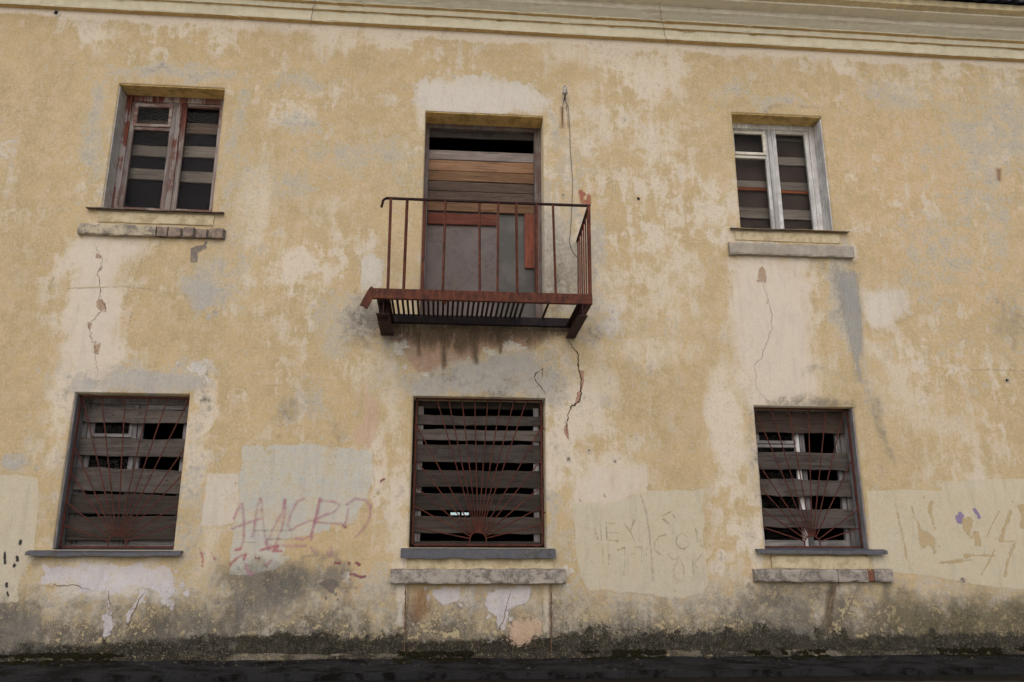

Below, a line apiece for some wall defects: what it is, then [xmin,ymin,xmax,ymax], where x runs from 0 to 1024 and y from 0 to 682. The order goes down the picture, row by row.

peeling [407,73,552,116]
crack [87,251,106,388]
peeling [55,234,212,397]
leakage [392,324,569,366]
leakage [840,273,862,379]
crack [556,334,584,444]
leakage [0,605,41,653]
peeling [41,560,190,652]
peeling [424,584,463,607]
peeling [483,583,550,649]
leakage [826,583,836,627]
leakage [884,584,1024,640]